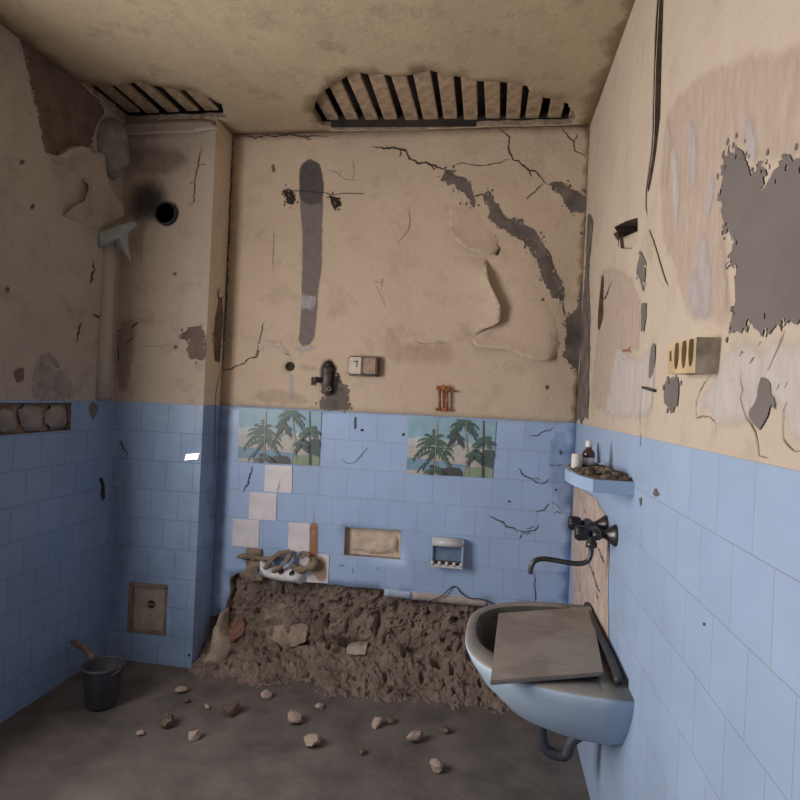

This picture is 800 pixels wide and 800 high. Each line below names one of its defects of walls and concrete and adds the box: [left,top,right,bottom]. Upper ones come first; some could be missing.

flaking render [19,41,105,156]
crack [372,130,550,198]
flaking render [174,289,224,364]
leakage [295,159,323,352]
peeling [549,180,681,424]
flaking render [699,132,800,436]
peeling [0,352,76,434]
peeling [573,486,605,521]
spalling [187,573,513,716]
peeling [572,530,609,645]